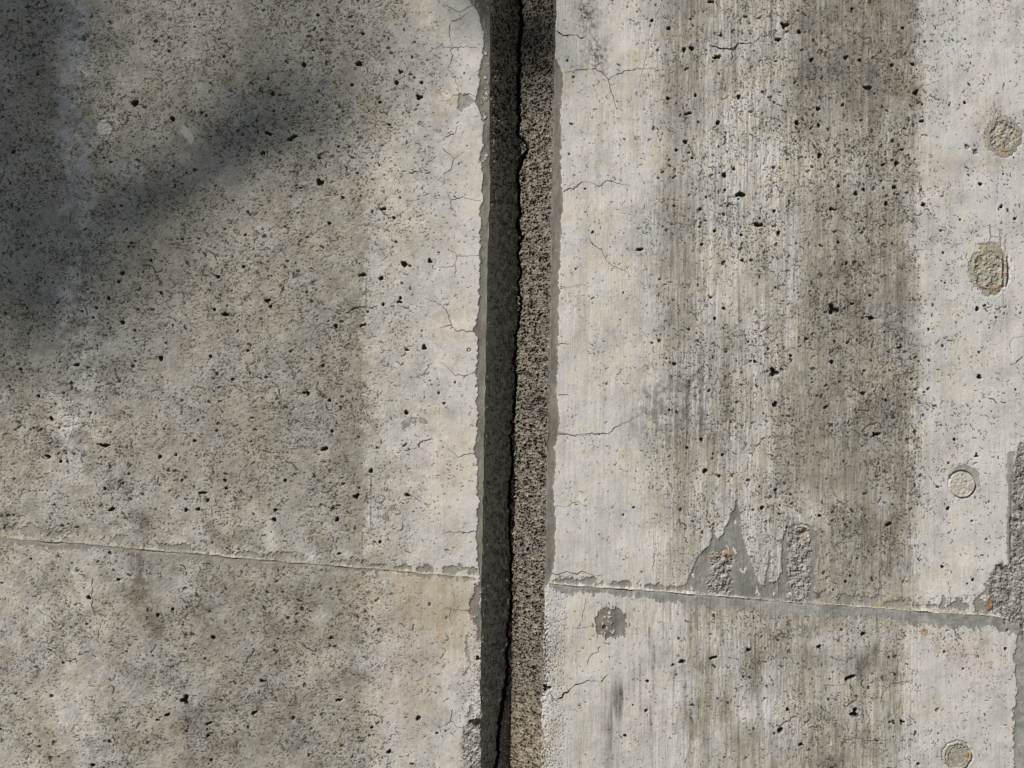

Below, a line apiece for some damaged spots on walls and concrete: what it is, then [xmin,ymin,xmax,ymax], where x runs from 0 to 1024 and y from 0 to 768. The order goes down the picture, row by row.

crack [438,5,472,101]
crack [396,126,478,216]
peeling [545,60,1024,768]